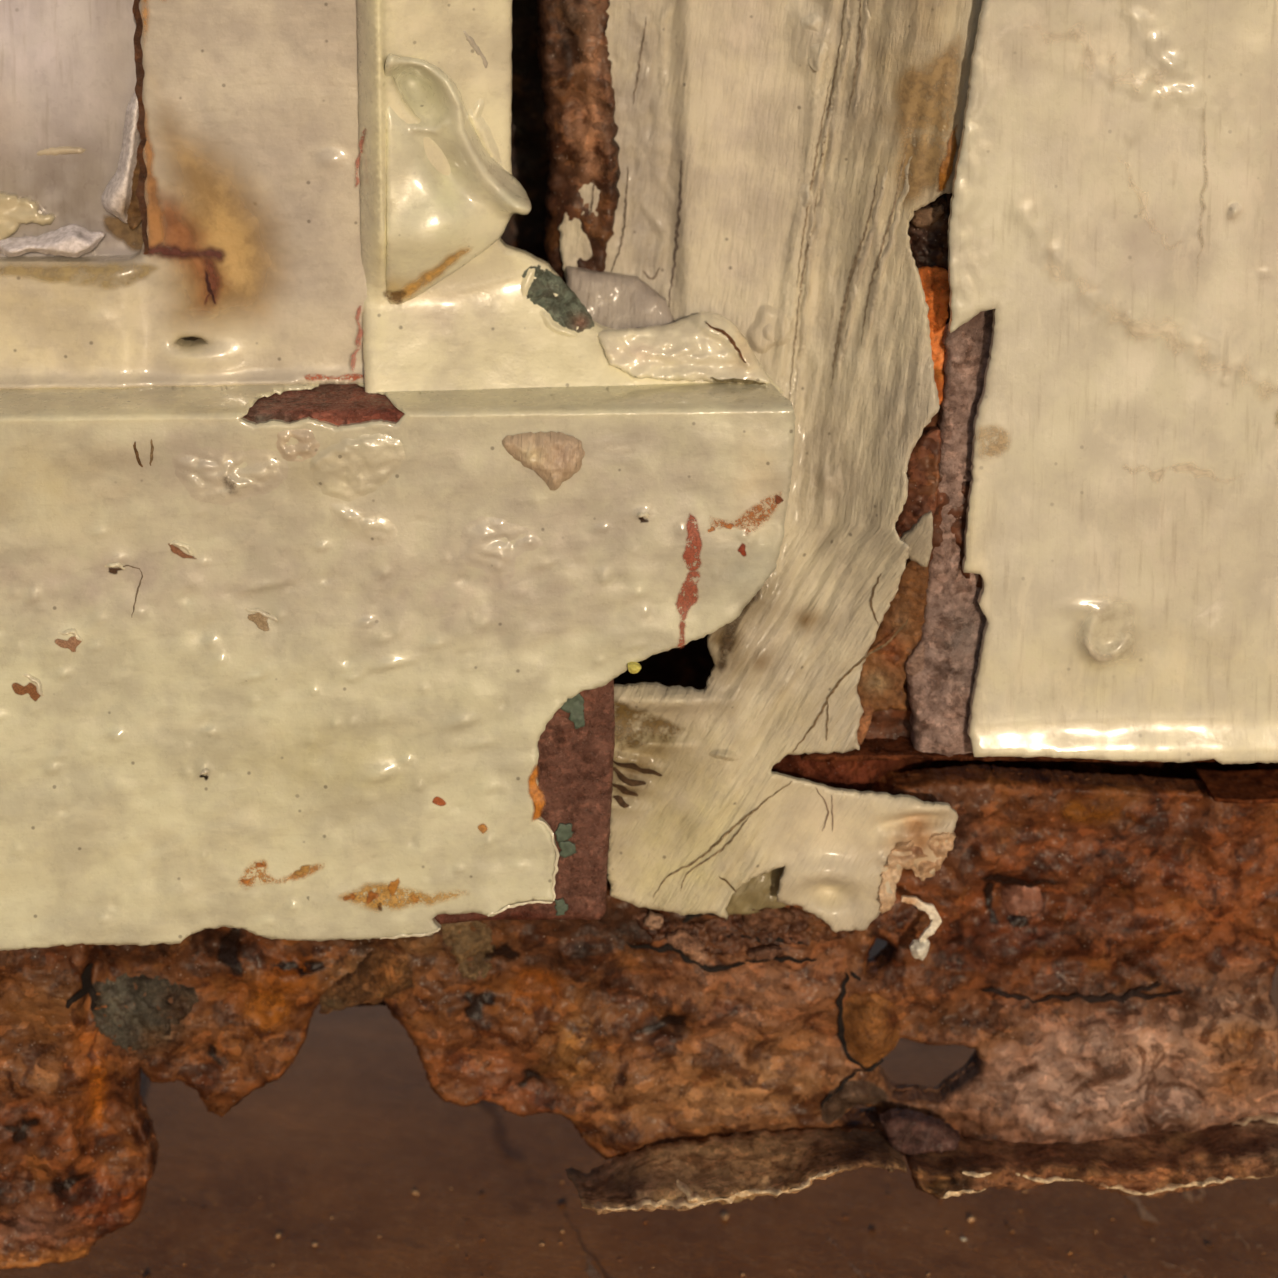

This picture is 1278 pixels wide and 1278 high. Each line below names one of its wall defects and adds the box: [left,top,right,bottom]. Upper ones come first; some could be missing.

corrosion [536,0,621,283]
peeling [0,191,56,252]
corrosion [144,122,269,312]
peeling [243,384,404,425]
corrosion [857,47,982,745]
corrosion [676,496,783,647]
spalling [55,628,82,652]
spalling [12,673,44,701]
corrosion [288,865,321,879]
corrosion [343,879,457,911]
spalling [488,819,559,917]
peeling [879,1108,961,1156]